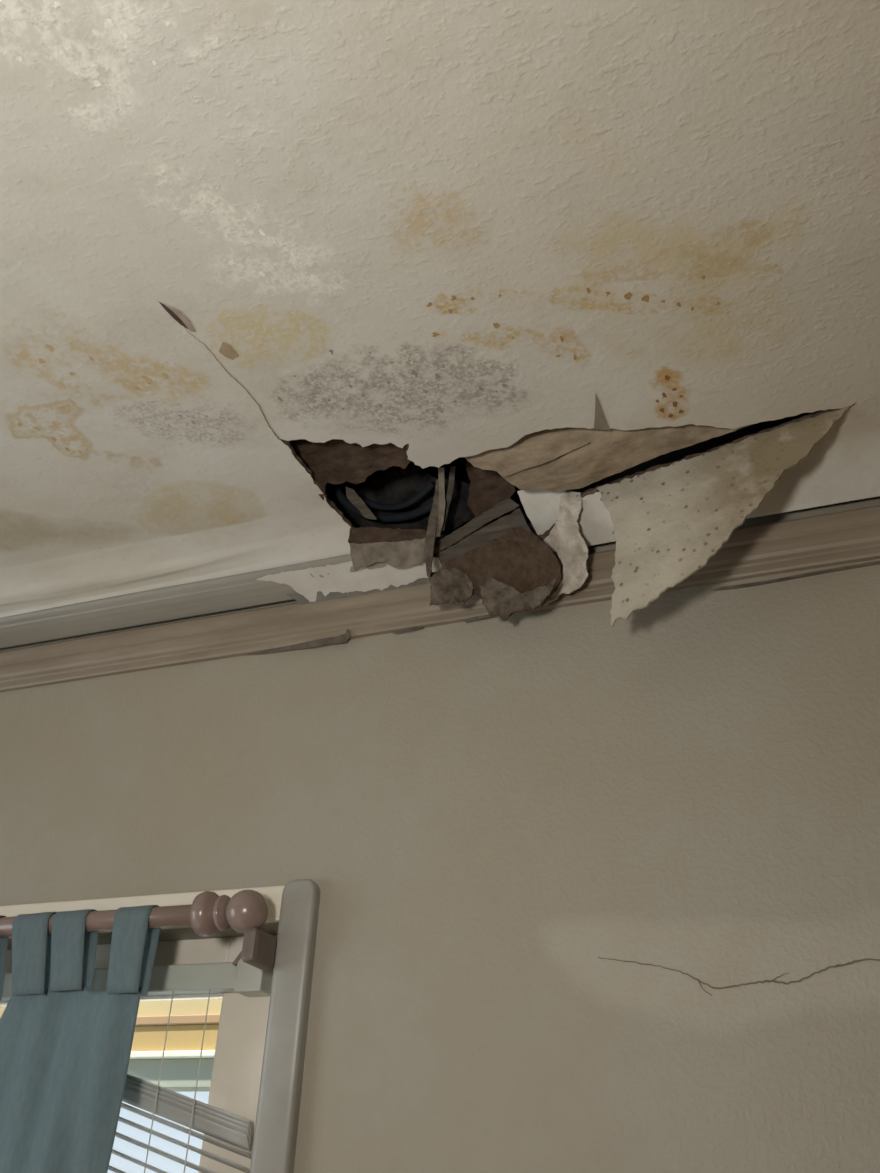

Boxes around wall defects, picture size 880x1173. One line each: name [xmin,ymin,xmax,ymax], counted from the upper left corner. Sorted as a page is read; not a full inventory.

leakage [375,168,498,265]
leakage [548,188,812,381]
crack [184,327,280,440]
leakage [0,298,547,469]
leakage [0,479,266,554]
spalling [325,457,471,527]
spalling [435,486,531,540]
spalling [566,410,820,496]
crack [598,957,880,996]